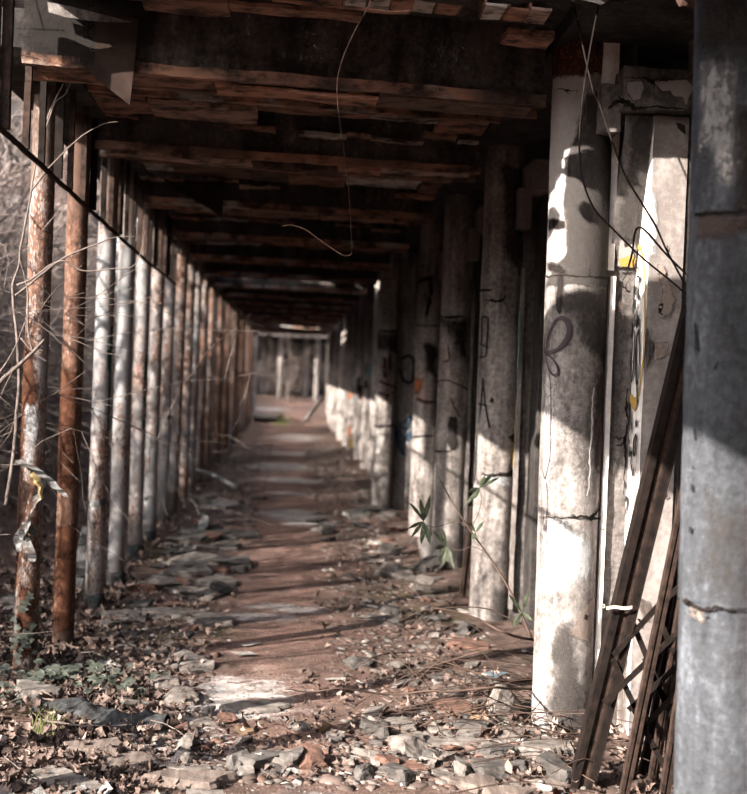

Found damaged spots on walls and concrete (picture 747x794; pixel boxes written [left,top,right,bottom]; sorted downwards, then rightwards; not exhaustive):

peeling [626,80,645,101]
peeling [654,79,693,105]
water stain [546,93,612,496]
rust [20,341,38,460]
rust [57,367,79,493]
crack [541,505,601,521]
rust [52,524,76,633]
crack [682,598,747,611]
water stain [548,623,580,733]